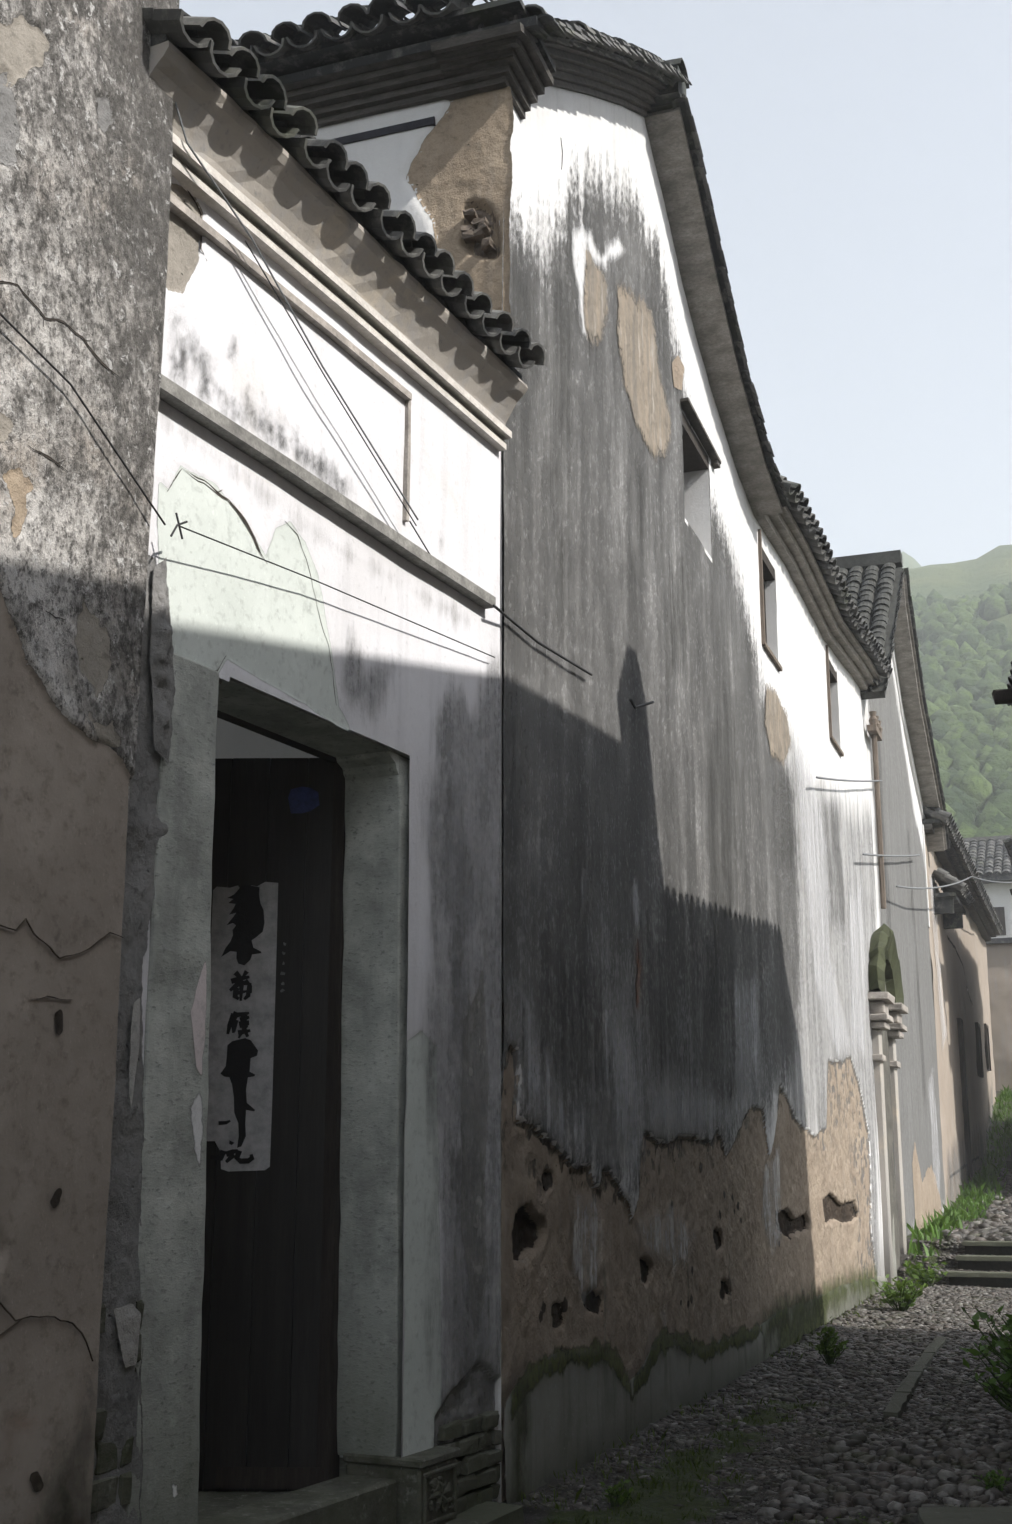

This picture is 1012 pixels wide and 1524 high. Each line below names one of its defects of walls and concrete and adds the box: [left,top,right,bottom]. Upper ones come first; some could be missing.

peeling [166,183,207,294]
leakage [247,397,345,492]
spalling [406,86,514,314]
spalling [573,227,684,458]
leakage [427,150,993,1444]
spalling [764,684,791,765]
crack [0,918,124,959]
spalling [0,466,349,1524]
crack [0,1302,93,1361]
spalling [402,1031,876,1515]